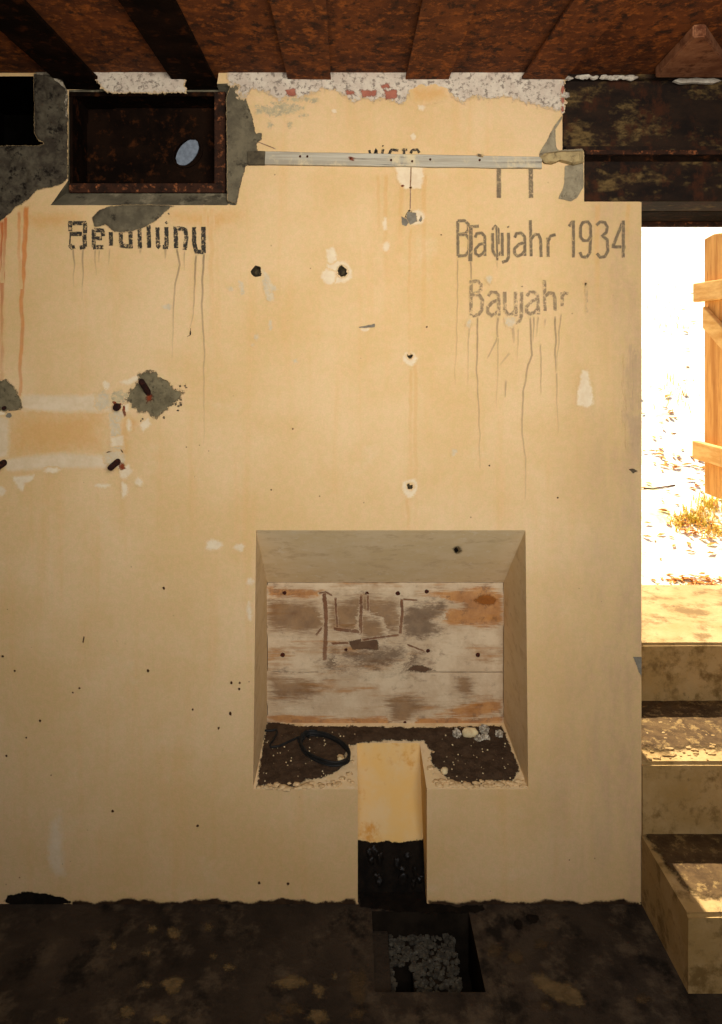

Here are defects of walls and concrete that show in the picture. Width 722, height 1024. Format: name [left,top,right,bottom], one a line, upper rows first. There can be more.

spalling [0,72,69,221]
peeling [226,72,568,114]
flaking render [0,379,23,418]
rust [0,205,86,397]
flaking render [93,369,188,434]
damp [164,248,206,446]
damp [454,259,562,500]
peeling [575,367,596,409]